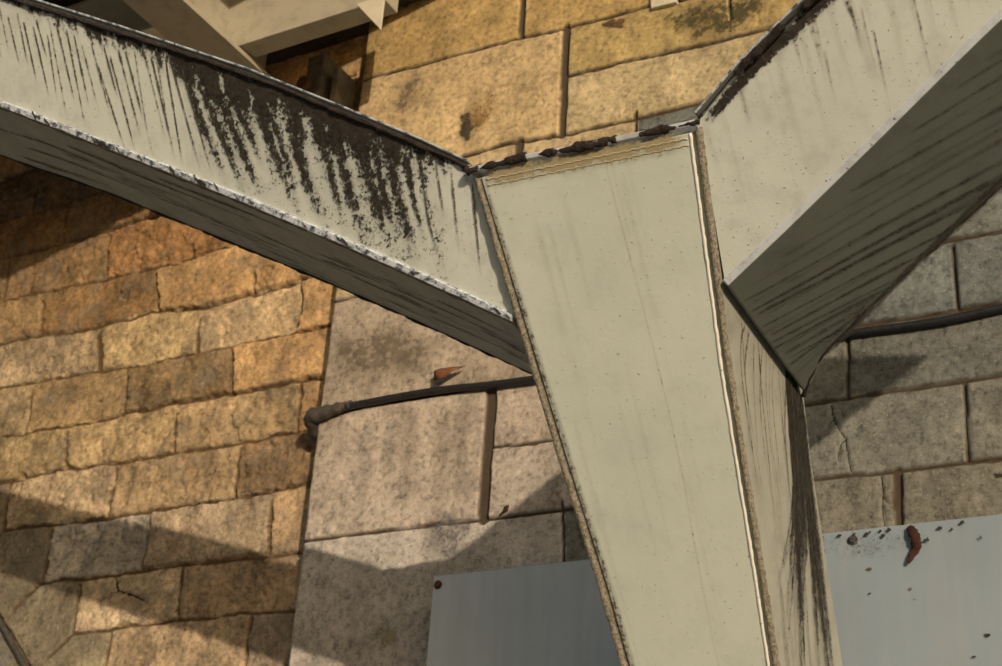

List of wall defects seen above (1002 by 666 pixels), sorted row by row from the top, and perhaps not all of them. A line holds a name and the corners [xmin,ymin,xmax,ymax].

damp [0,11,529,363]
damp [339,329,426,379]
crack [828,405,852,473]
damp [740,169,991,666]